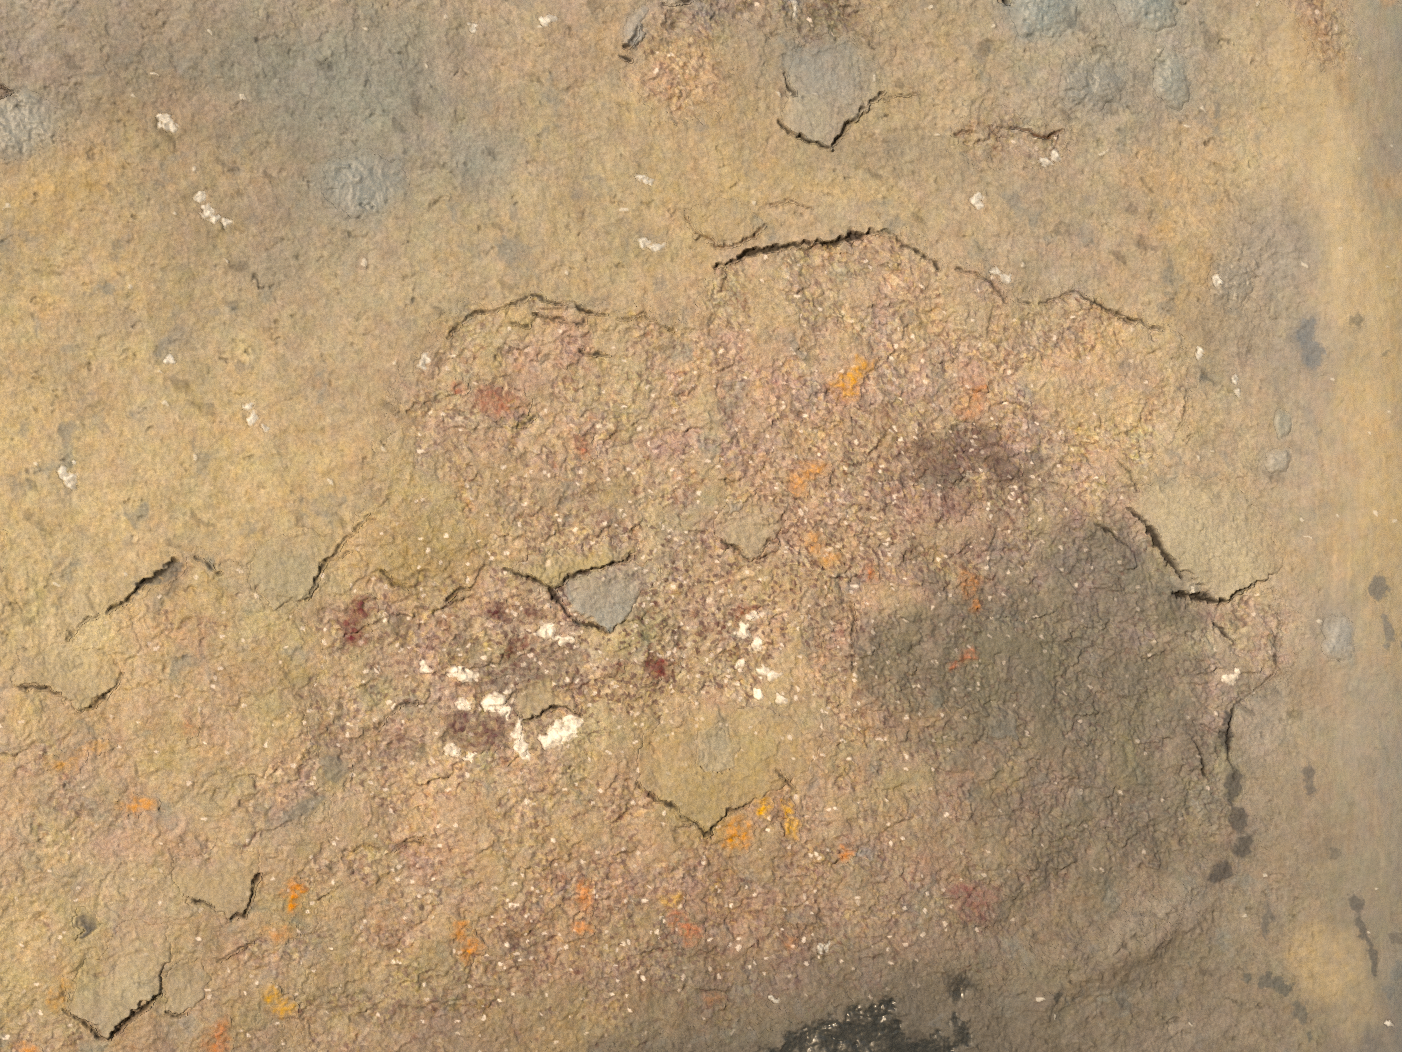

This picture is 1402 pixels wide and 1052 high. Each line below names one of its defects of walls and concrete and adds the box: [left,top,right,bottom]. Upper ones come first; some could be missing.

crack [777,70,922,151]
crack [684,196,1165,331]
corrosion [825,352,879,406]
leakage [1290,312,1330,378]
crack [65,556,223,641]
crack [503,554,634,636]
spalling [0,197,1303,1052]
crack [1093,458,1283,784]
leakage [1363,570,1402,658]
corrosion [716,794,803,855]
leakage [1345,887,1402,1007]
leakage [944,987,983,1052]